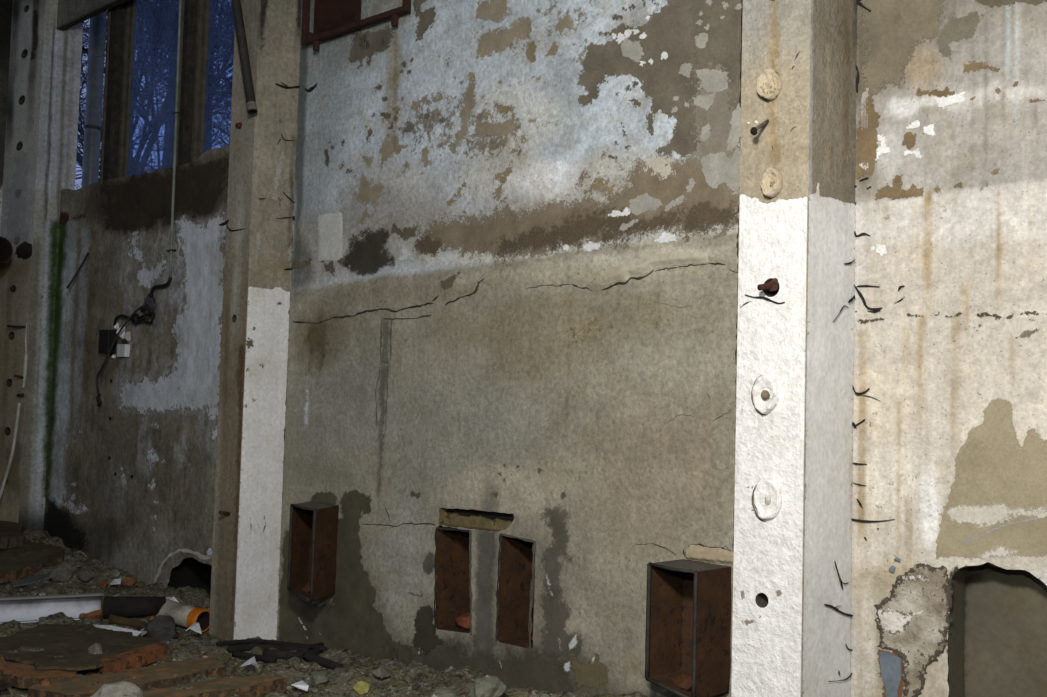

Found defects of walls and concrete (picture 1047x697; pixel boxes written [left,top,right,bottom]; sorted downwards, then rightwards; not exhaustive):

leakage [100,158,229,233]
peeling [322,72,539,242]
peeling [475,0,534,60]
peeling [577,0,742,158]
crack [737,0,745,151]
peeling [874,174,941,200]
peeling [855,0,1047,179]
leakage [43,221,88,552]
crack [289,275,484,440]
crack [526,187,740,431]
leakage [277,321,608,693]
spalling [874,557,953,697]